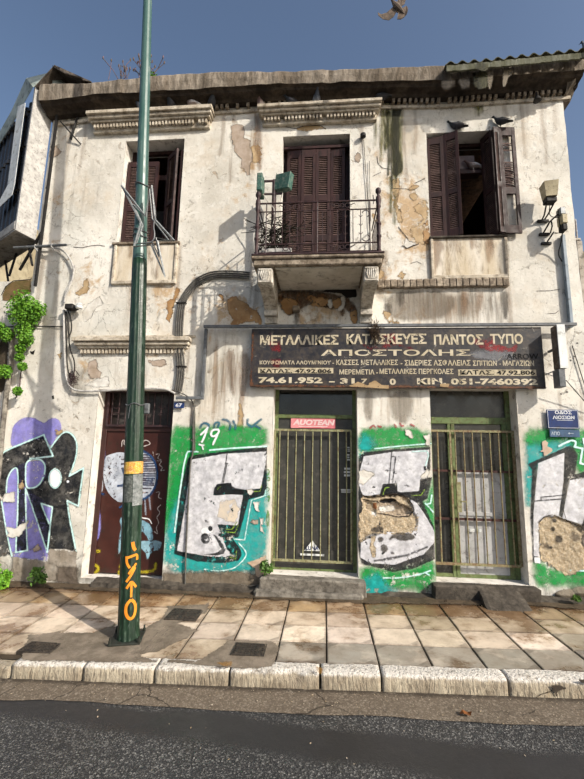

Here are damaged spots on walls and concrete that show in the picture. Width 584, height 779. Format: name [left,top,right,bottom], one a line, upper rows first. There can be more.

flaking render [230,124,253,175]
water stain [382,102,403,178]
flaking render [392,185,431,249]
flaking render [75,278,90,298]
flaking render [166,287,180,323]
flaking render [218,294,262,325]
flaking render [358,469,419,558]
flaking render [537,514,584,576]